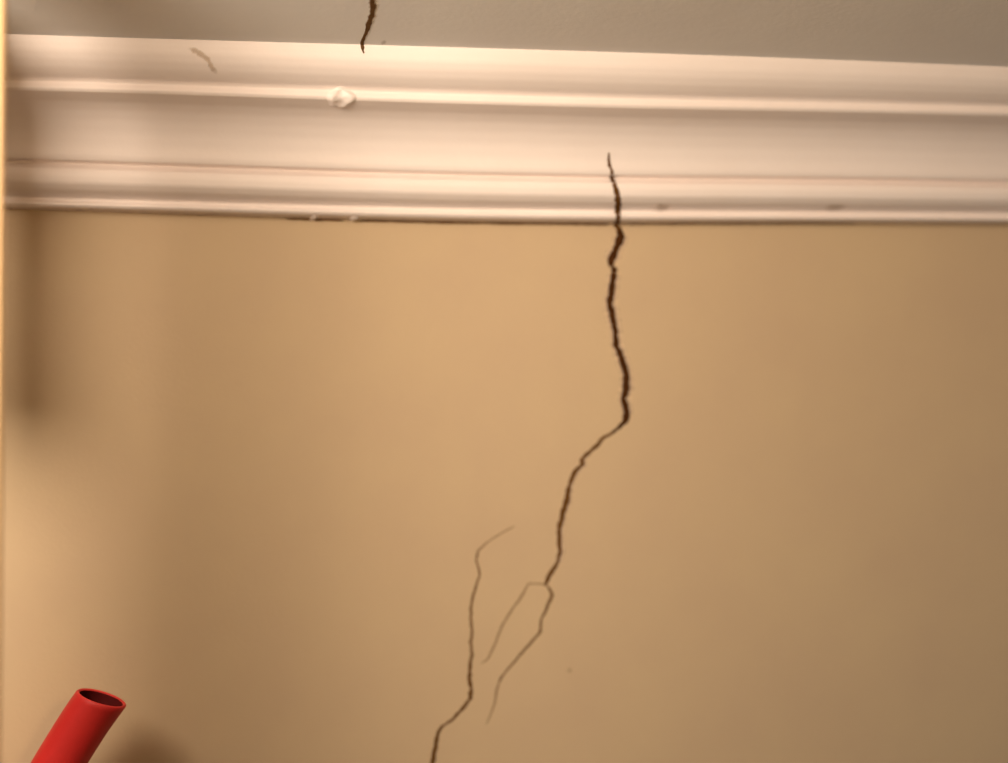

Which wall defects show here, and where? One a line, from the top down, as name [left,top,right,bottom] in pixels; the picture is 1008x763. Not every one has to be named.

crack [360,0,377,53]
crack [500,153,631,681]
crack [430,554,480,763]